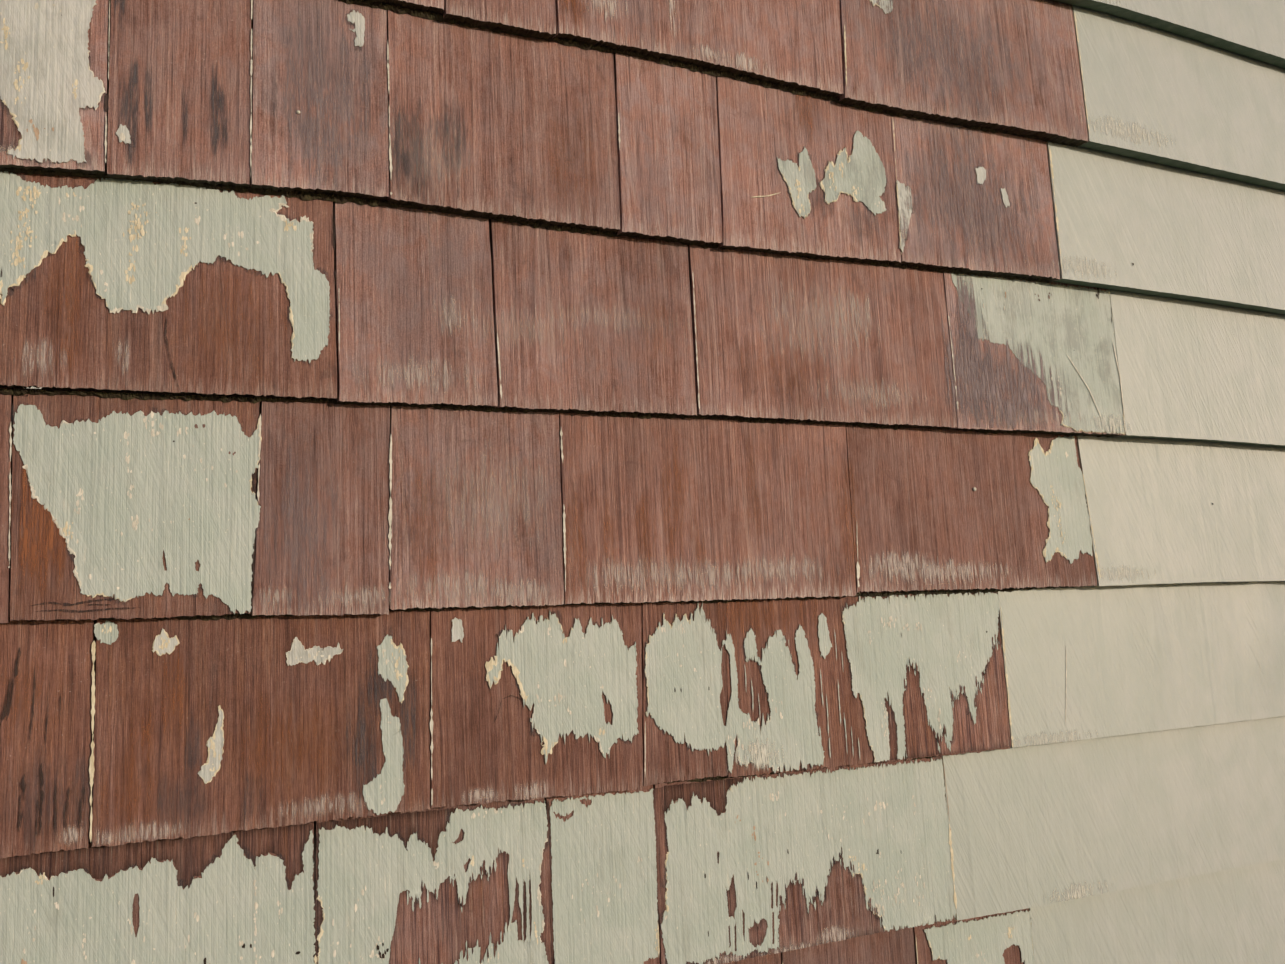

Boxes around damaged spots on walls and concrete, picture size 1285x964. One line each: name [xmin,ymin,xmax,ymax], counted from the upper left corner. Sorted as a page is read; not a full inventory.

peeling [870,0,893,14]
peeling [0,0,330,363]
peeling [777,131,912,252]
peeling [13,404,262,614]
peeling [950,273,1126,564]
peeling [0,590,1035,964]